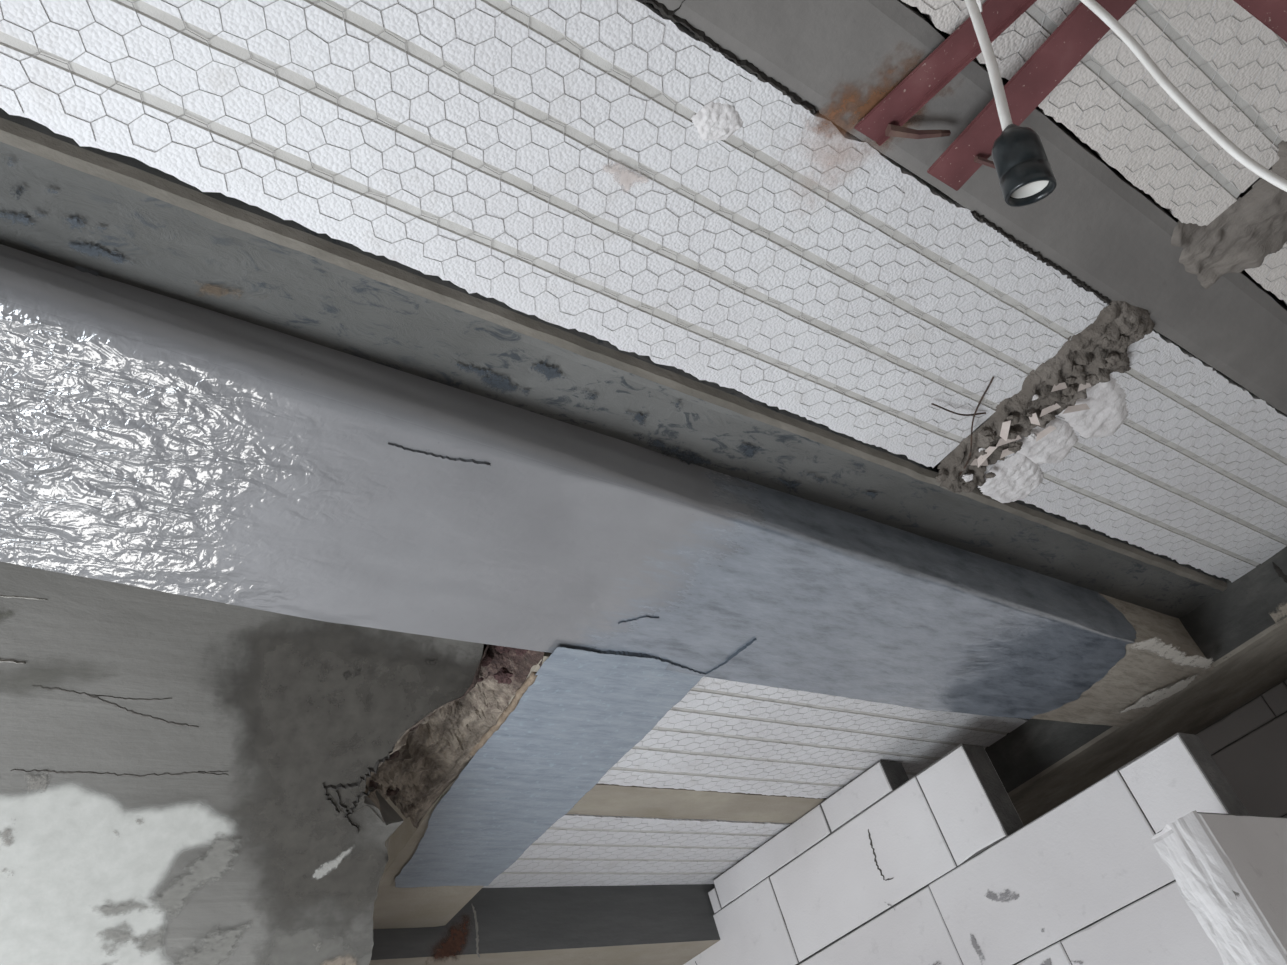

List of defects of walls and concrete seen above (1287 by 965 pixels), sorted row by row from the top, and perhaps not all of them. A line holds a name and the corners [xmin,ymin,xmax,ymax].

crack [642,0,819,113]
rust [817,58,919,137]
crack [971,211,1111,305]
crack [32,685,198,727]
crack [11,769,229,777]
damp [99,628,480,965]
spalling [355,644,544,829]